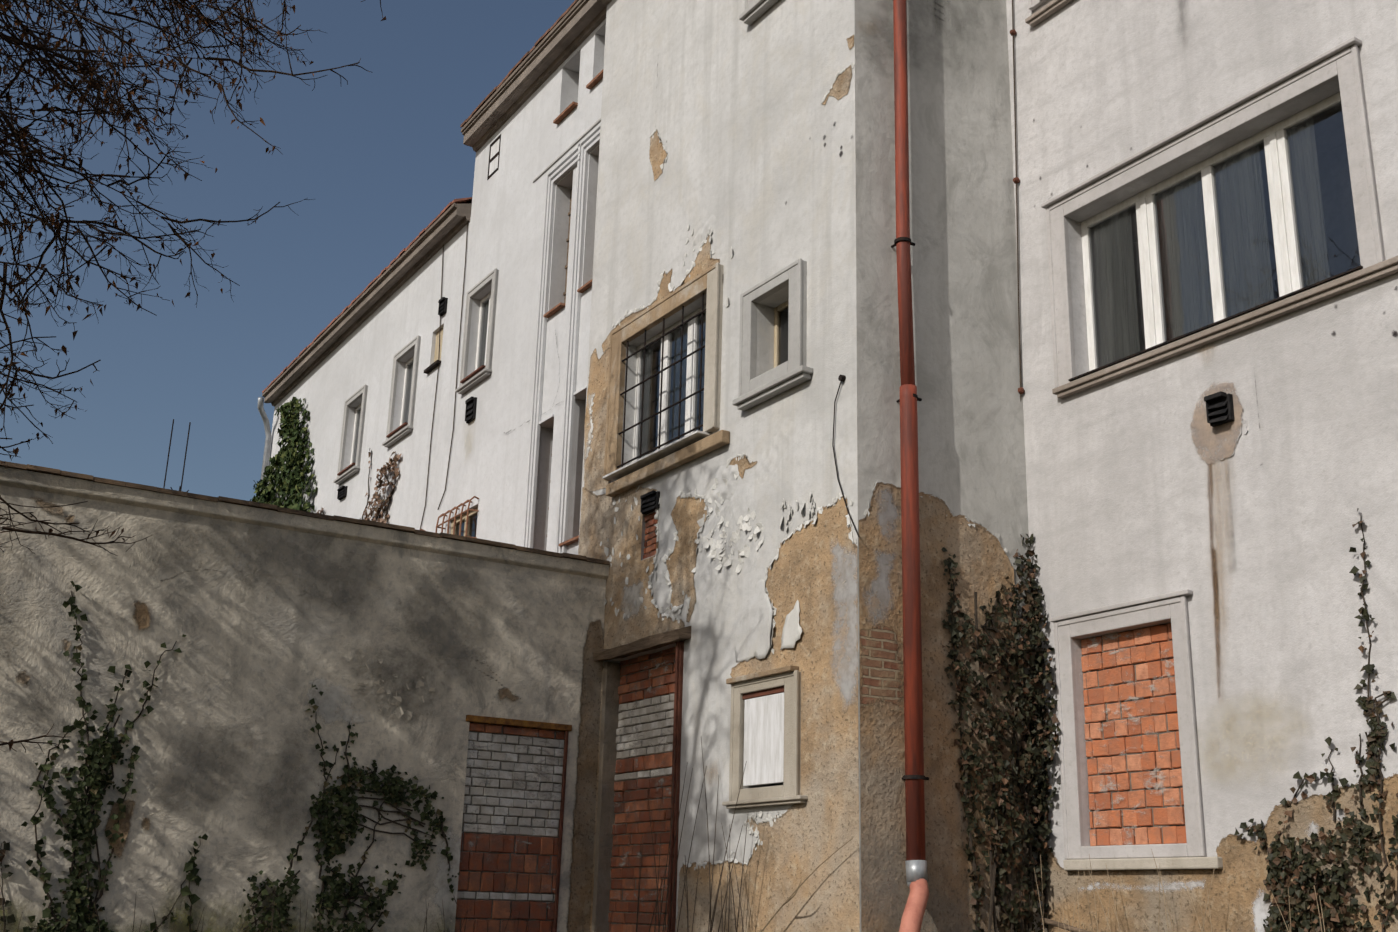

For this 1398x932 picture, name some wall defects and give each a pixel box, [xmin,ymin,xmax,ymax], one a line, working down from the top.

spalling [821,35,854,105]
spalling [649,128,668,181]
peeling [726,453,757,478]
damp [179,525,376,605]
peeling [567,224,733,932]
spalling [133,601,150,630]
peeling [676,481,910,932]
peeling [919,492,1398,932]
spalling [105,799,150,857]